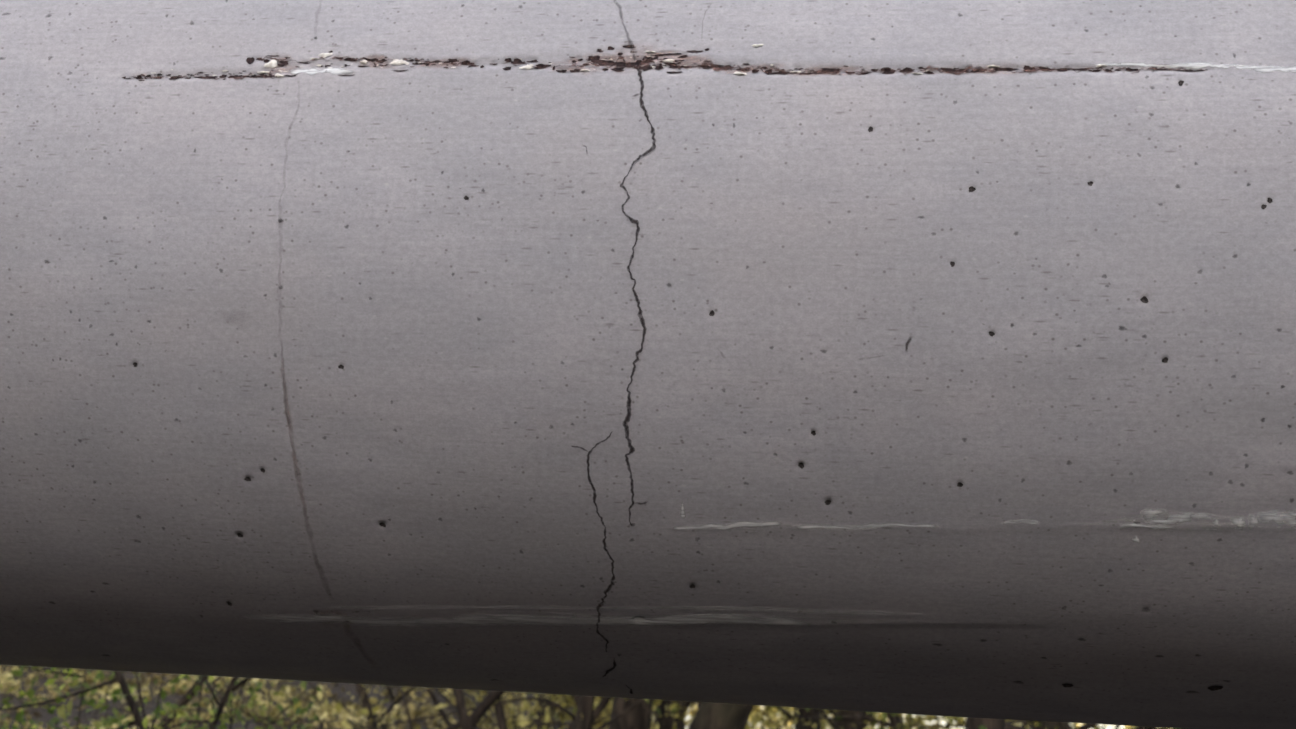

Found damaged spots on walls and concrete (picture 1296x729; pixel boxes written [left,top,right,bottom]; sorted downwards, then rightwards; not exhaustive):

crack [572,3,656,694]
spalling [122,45,1207,81]